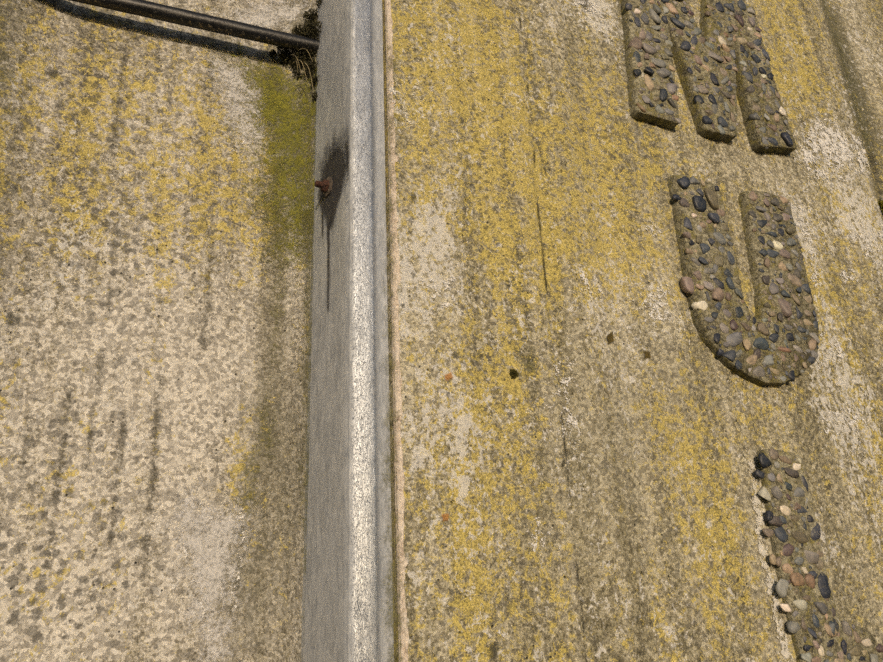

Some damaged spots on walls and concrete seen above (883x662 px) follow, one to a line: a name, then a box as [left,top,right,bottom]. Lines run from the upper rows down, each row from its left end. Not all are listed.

water stain [302,132,349,427]